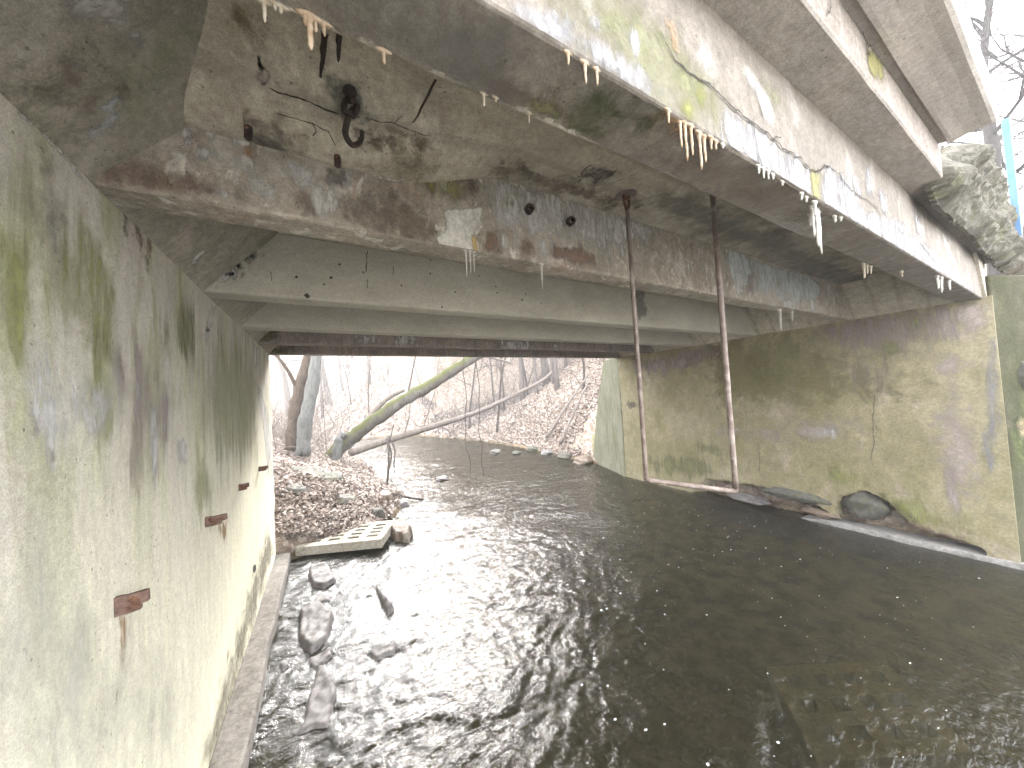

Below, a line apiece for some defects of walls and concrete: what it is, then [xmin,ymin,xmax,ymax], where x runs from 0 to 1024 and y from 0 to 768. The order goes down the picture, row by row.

crack [270,88,338,146]
crack [366,116,430,136]
damp [488,97,593,143]
crack [661,32,936,263]
damp [660,193,873,285]
damp [7,244,28,362]
damp [92,340,187,477]
rust [120,596,141,647]